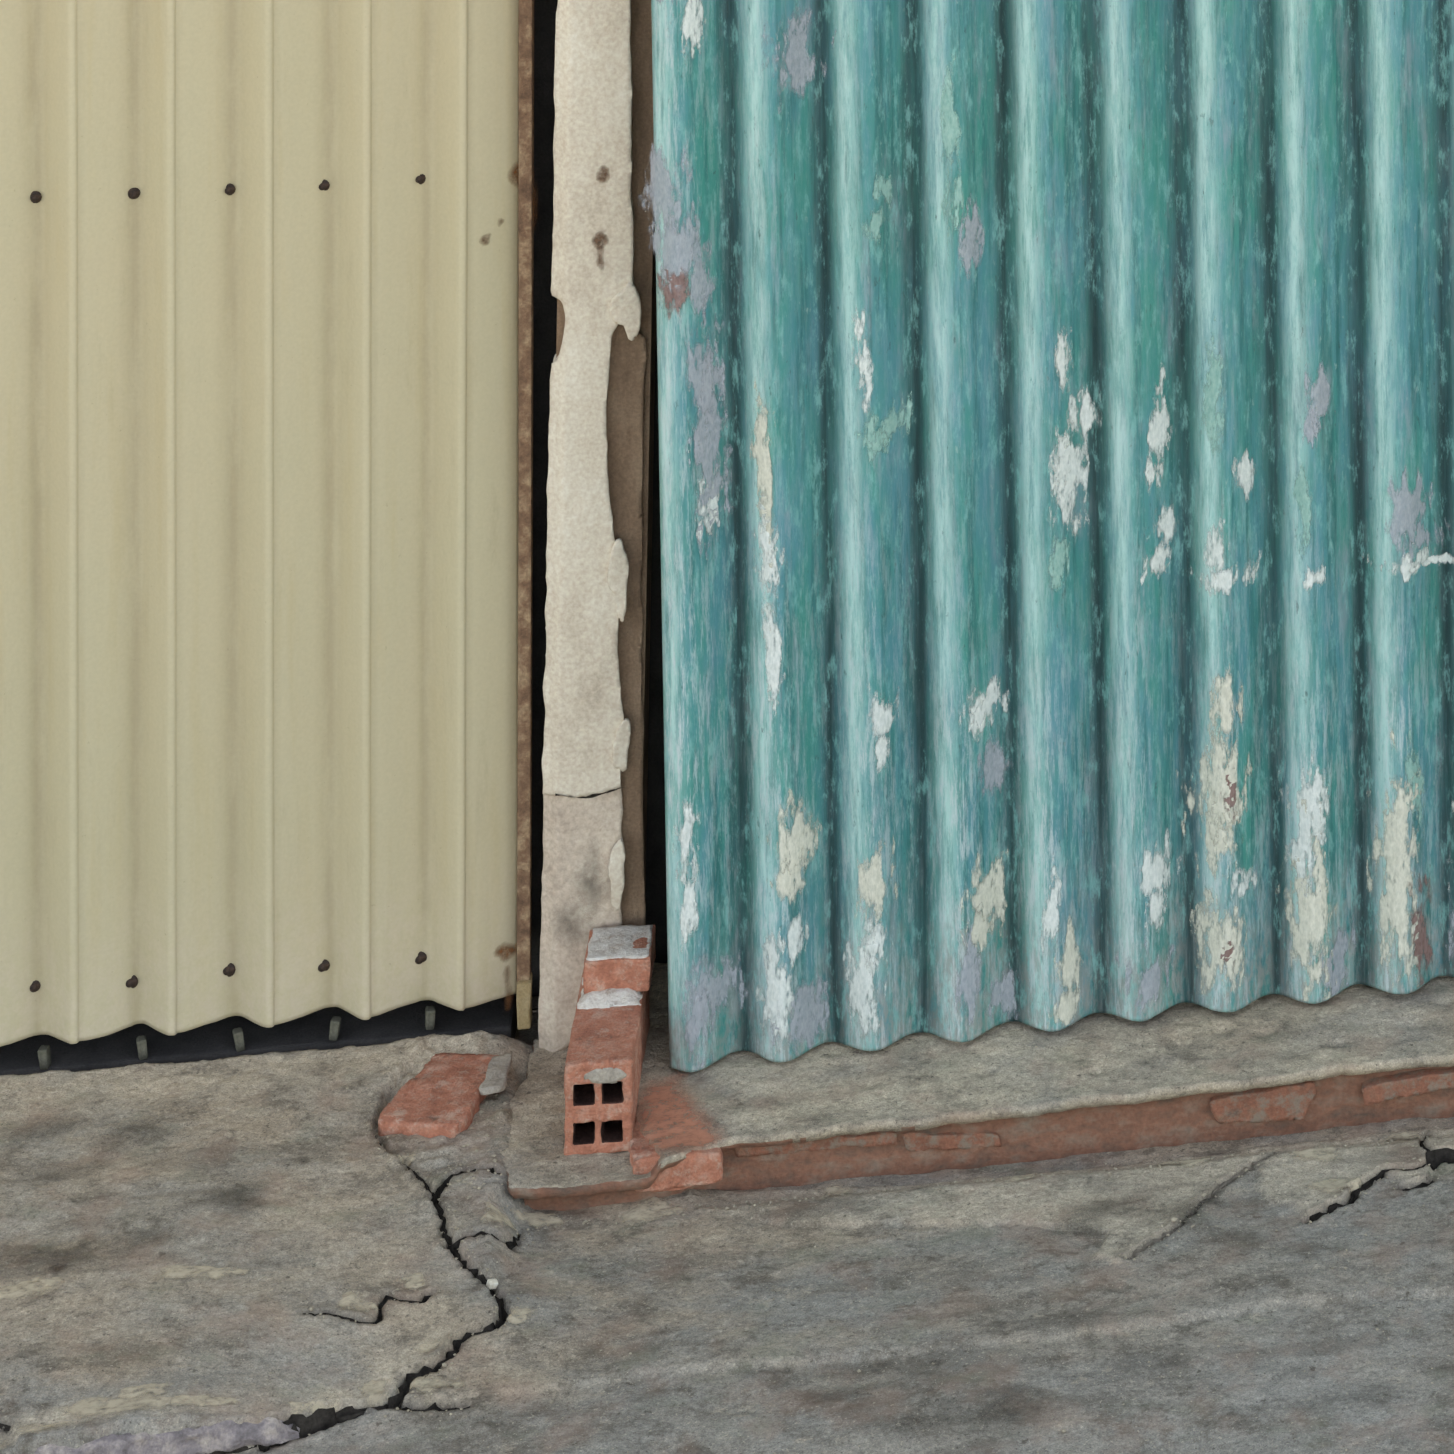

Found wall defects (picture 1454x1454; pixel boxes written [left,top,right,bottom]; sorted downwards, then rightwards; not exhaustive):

corrosion [511,165,534,216]
flaking render [607,283,647,926]
peeling [750,384,785,710]
peeling [1048,334,1095,589]
corrosion [496,946,516,975]
peeling [685,790,829,1070]
peeling [843,836,898,1034]
peeling [1117,667,1257,1014]
peeling [1286,757,1355,1001]
peeling [1367,731,1454,986]
crack [298,1135,536,1418]
crack [1297,1129,1454,1228]